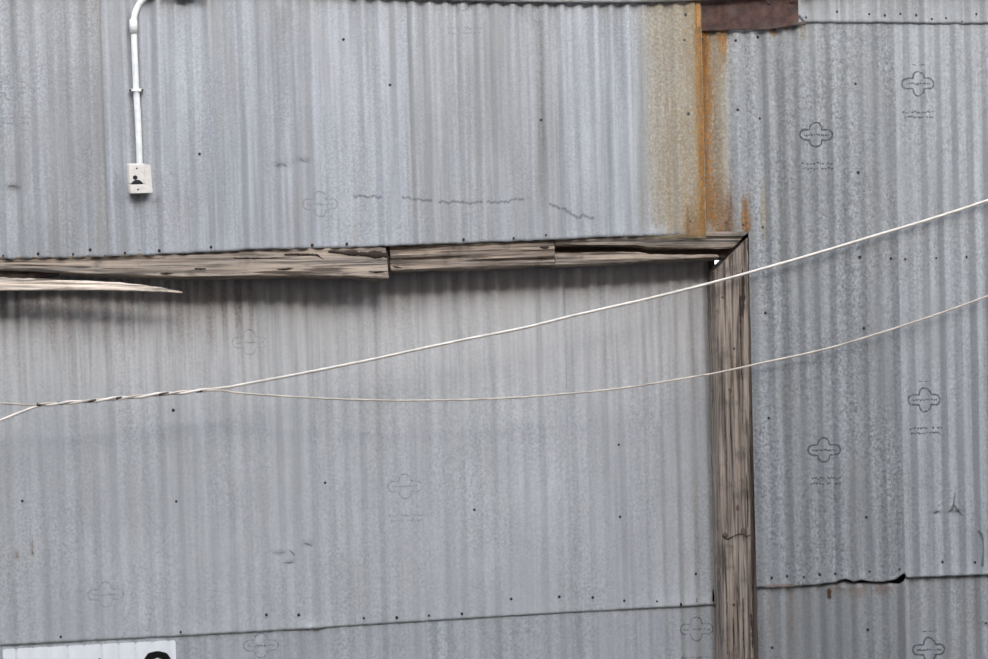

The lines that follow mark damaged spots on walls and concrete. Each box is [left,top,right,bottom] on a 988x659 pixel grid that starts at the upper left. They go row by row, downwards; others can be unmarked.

rust [687,2,750,236]